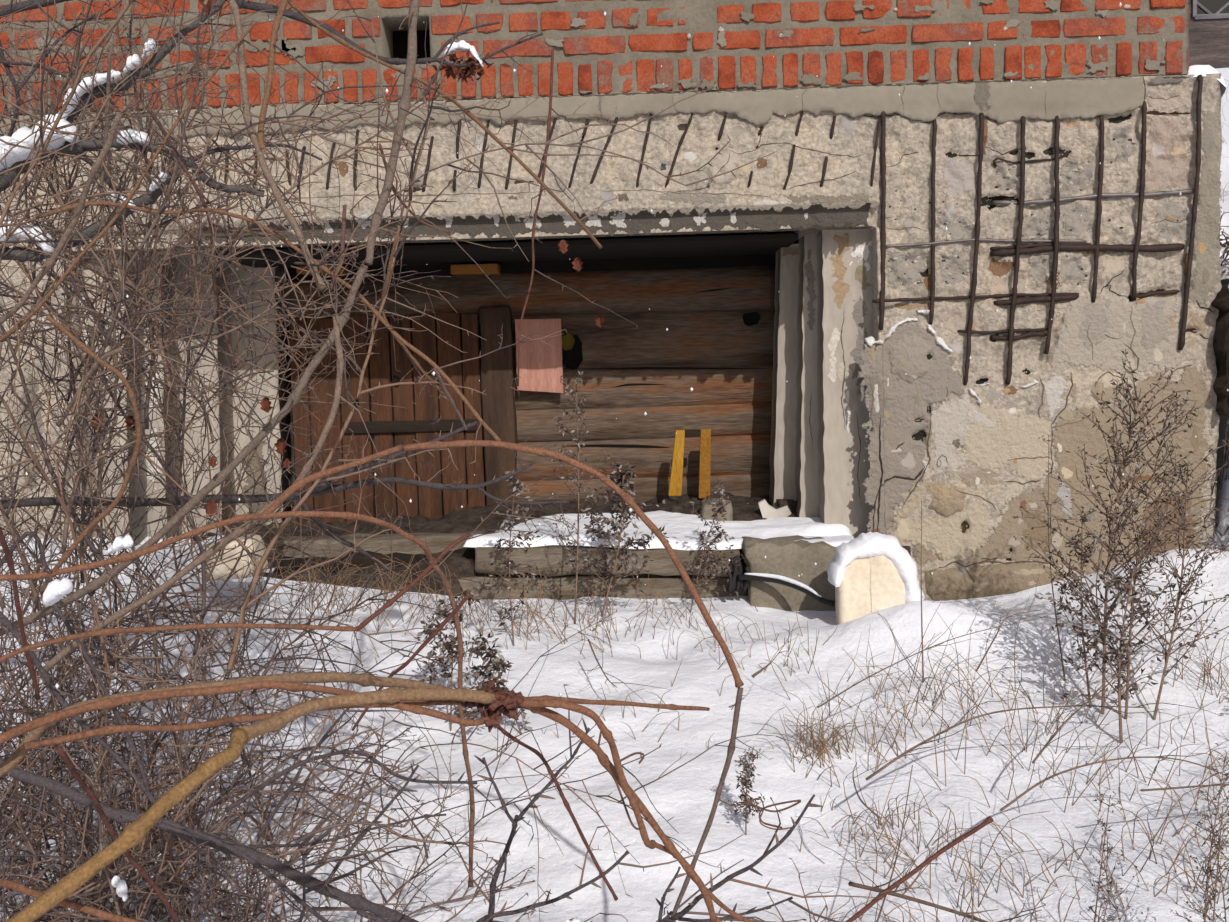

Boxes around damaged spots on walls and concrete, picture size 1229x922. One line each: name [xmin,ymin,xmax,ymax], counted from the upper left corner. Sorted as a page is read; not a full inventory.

spalling [1108,85,1195,193]
peeling [560,210,627,228]
spalling [889,147,1095,284]
peeling [850,241,872,271]
rust [894,274,938,310]
spalling [988,275,1011,299]
rust [988,258,1014,277]
spalling [1027,219,1128,285]
rust [1182,242,1207,293]
spalling [865,305,998,360]
peeling [1021,359,1135,421]
peeling [891,378,996,544]